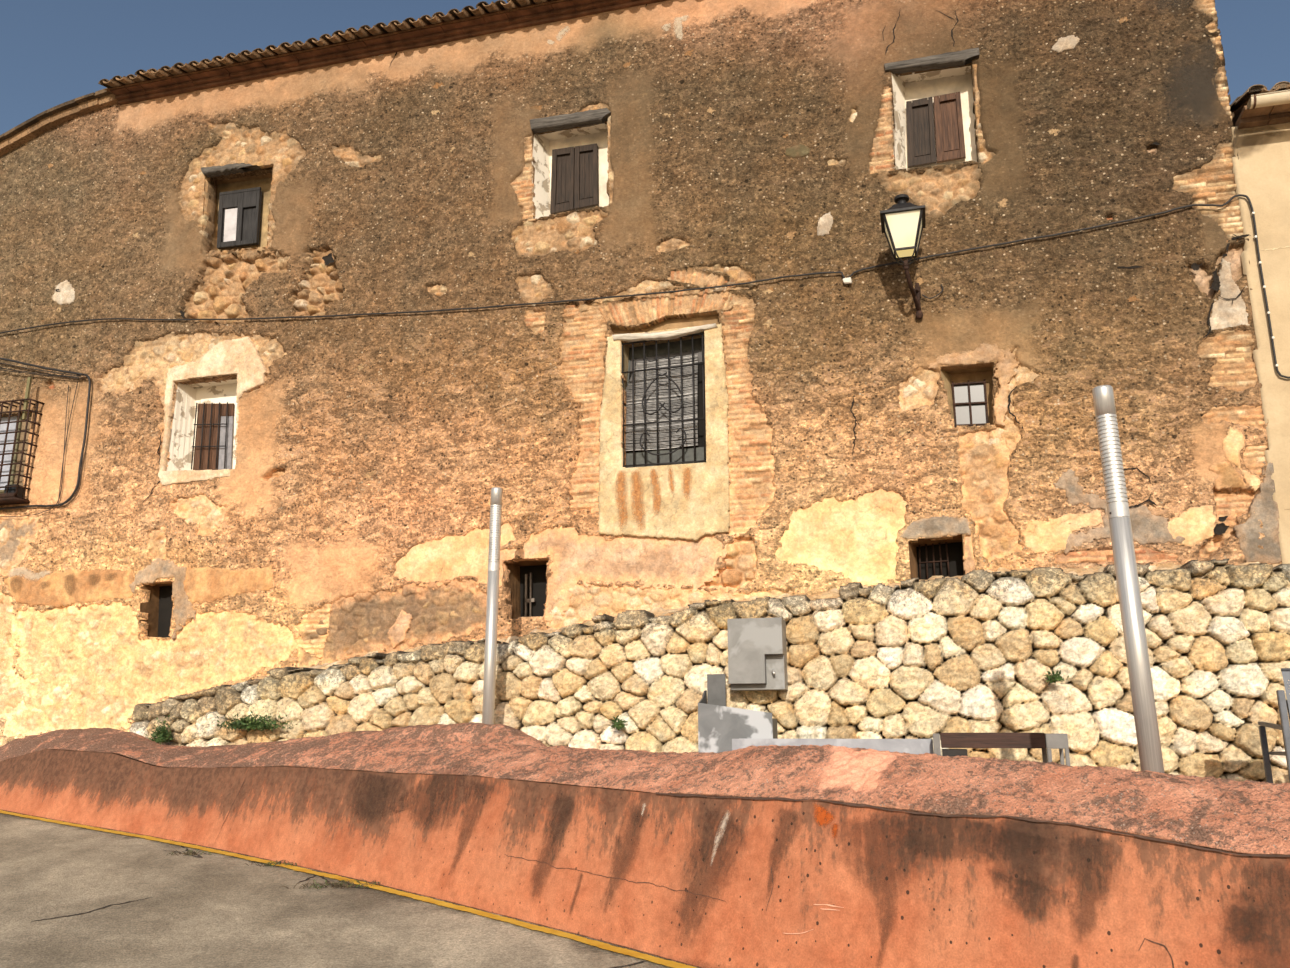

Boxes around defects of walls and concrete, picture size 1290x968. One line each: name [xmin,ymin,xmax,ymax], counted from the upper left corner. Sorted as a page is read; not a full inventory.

crack [882,8,901,54]
flaking render [869,85,895,178]
spalling [178,123,306,263]
flaking render [510,136,537,223]
flaking render [1172,142,1244,299]
spalling [288,247,344,316]
peeling [394,268,776,623]
flaking render [1135,330,1267,563]
rust [616,468,690,526]
peeling [775,489,907,585]
peeling [1023,509,1114,564]
peeling [3,569,134,607]